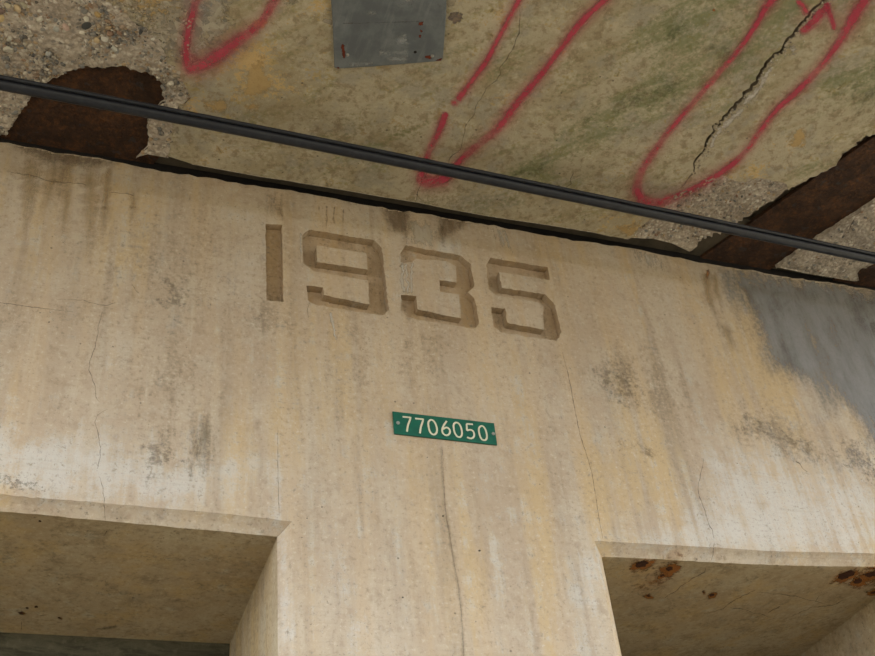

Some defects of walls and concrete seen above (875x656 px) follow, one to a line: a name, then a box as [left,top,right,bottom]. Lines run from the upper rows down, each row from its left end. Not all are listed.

spalling [0,0,191,109]
spalling [0,91,31,135]
spalling [136,118,174,158]
crack [683,0,837,186]
spalling [662,134,875,223]
spalling [193,164,721,252]
spalling [813,198,875,252]
spalling [775,249,873,281]
rust [630,555,681,599]
rust [829,567,875,596]